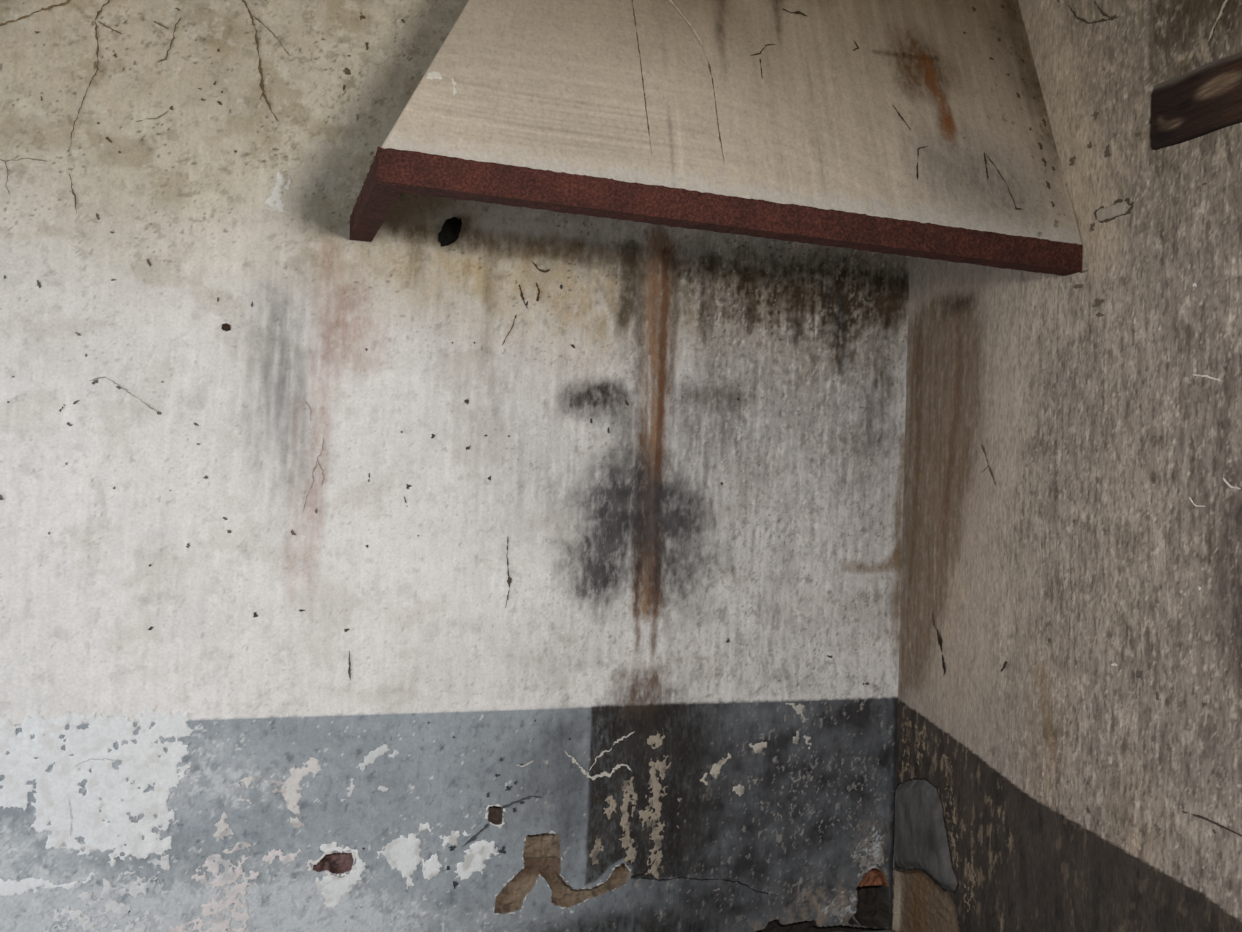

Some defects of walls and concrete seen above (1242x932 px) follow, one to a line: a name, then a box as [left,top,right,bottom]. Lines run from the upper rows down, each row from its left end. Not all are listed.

crack [0,0,122,212]
crack [154,17,182,62]
crack [242,0,290,122]
corrosion [888,39,952,131]
damp [467,233,642,341]
corrosion [633,228,672,647]
peeling [0,709,194,932]
peeling [164,757,525,932]
peeling [340,744,399,801]
flaking render [492,728,685,916]
corrosion [630,673,661,704]
flaking render [749,754,976,932]